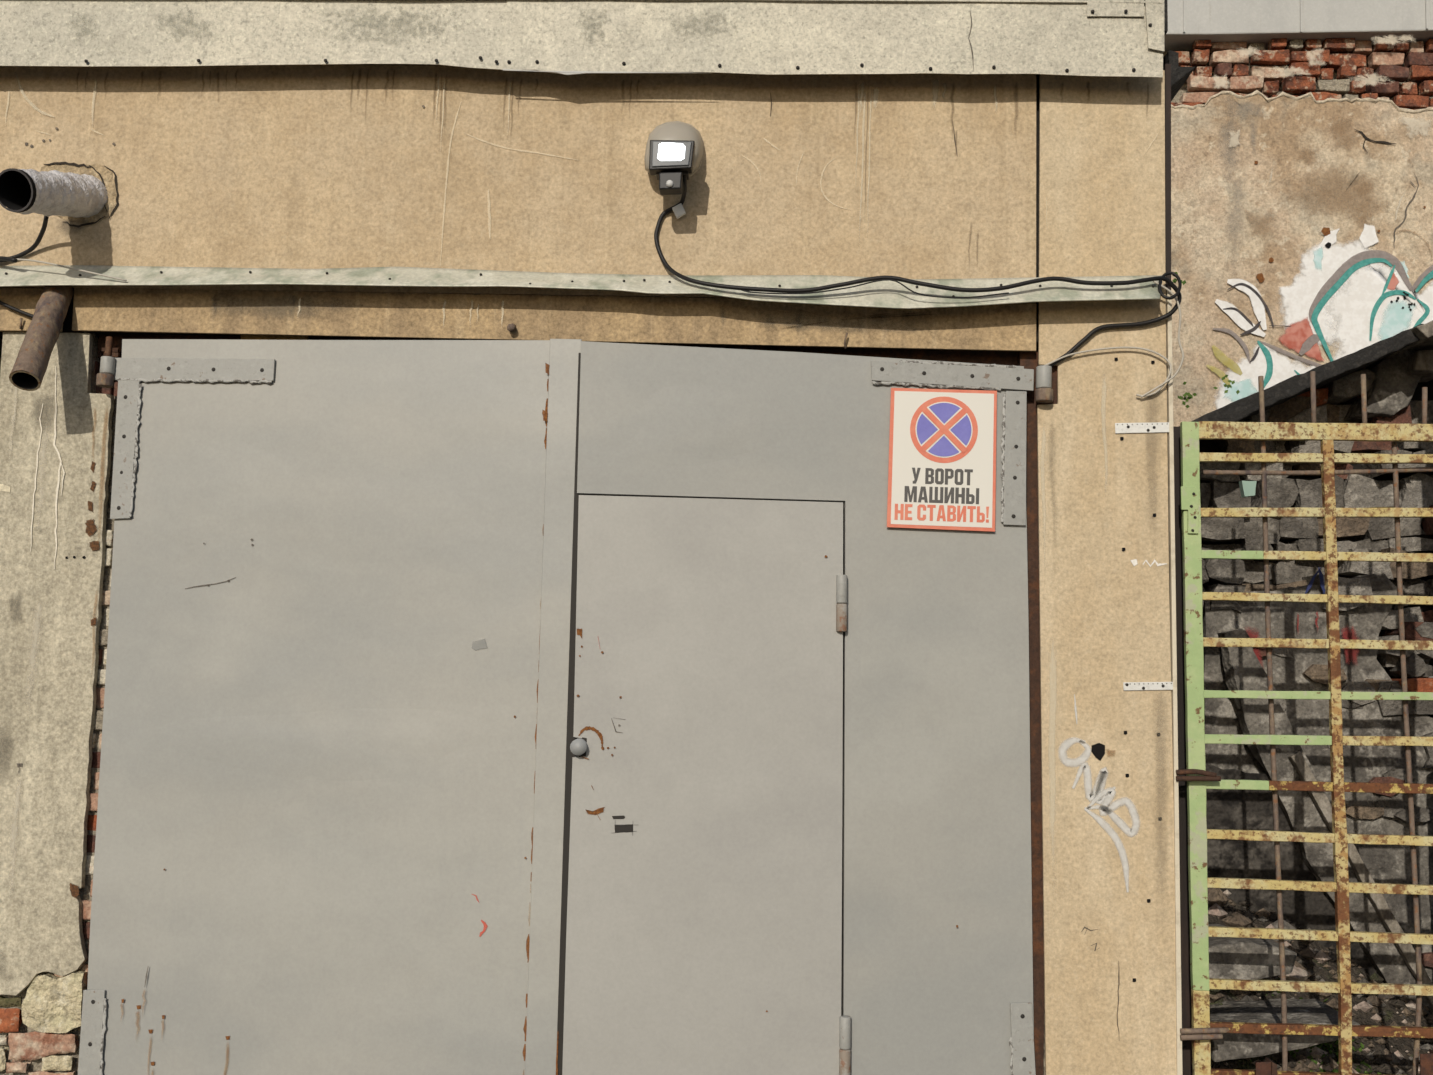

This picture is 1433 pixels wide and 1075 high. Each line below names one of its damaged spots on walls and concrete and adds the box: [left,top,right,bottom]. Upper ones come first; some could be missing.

flaking render [1171,38,1433,114]
spalling [0,969,88,1075]